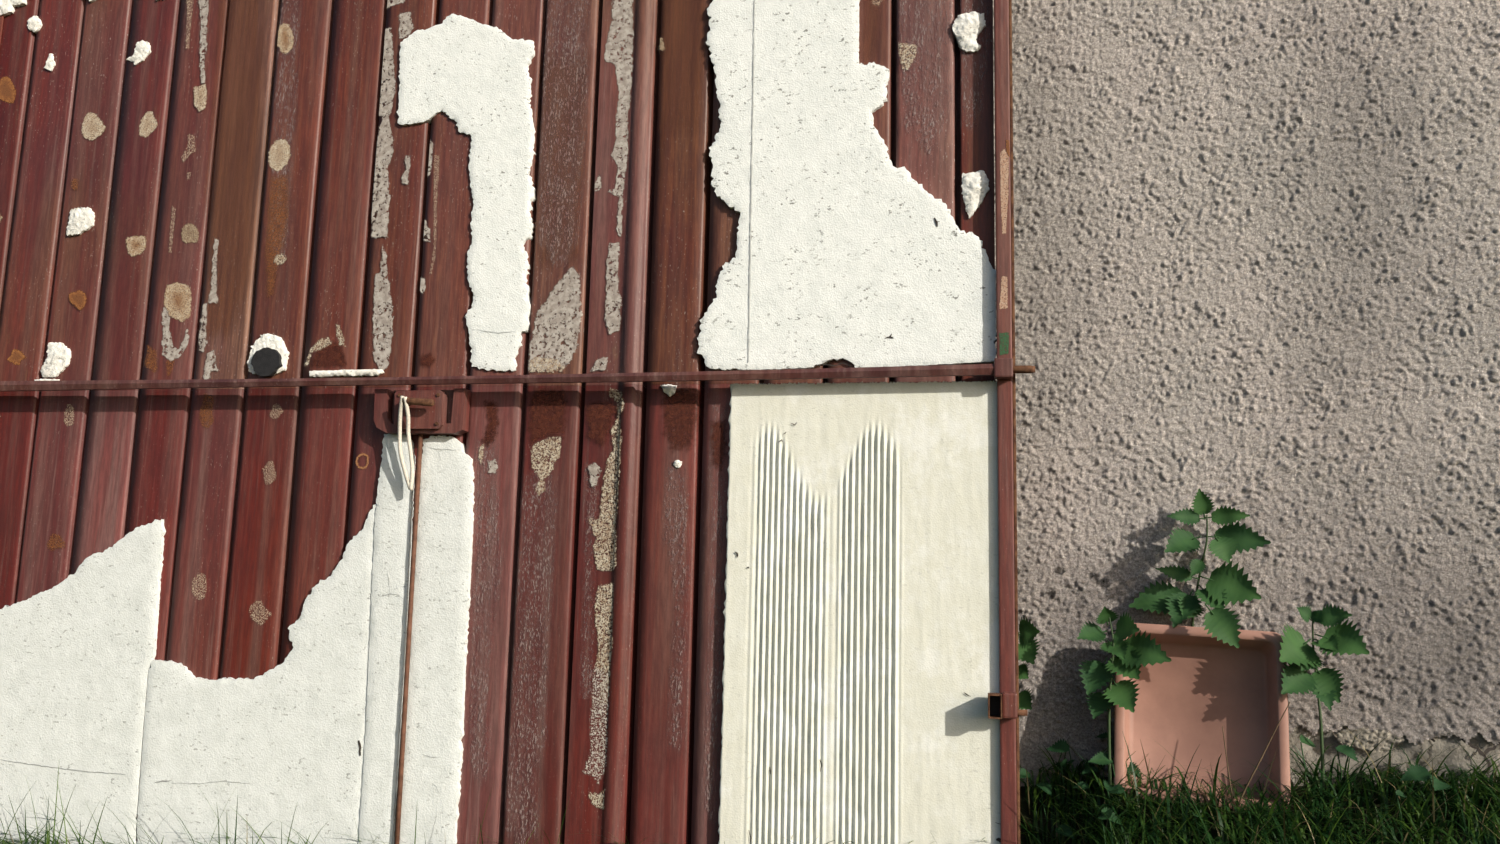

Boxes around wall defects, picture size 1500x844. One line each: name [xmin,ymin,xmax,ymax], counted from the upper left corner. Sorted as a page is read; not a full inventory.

peeling [161,239,219,379]
peeling [371,0,439,370]
peeling [470,0,634,844]
flaking render [1335,727,1404,753]